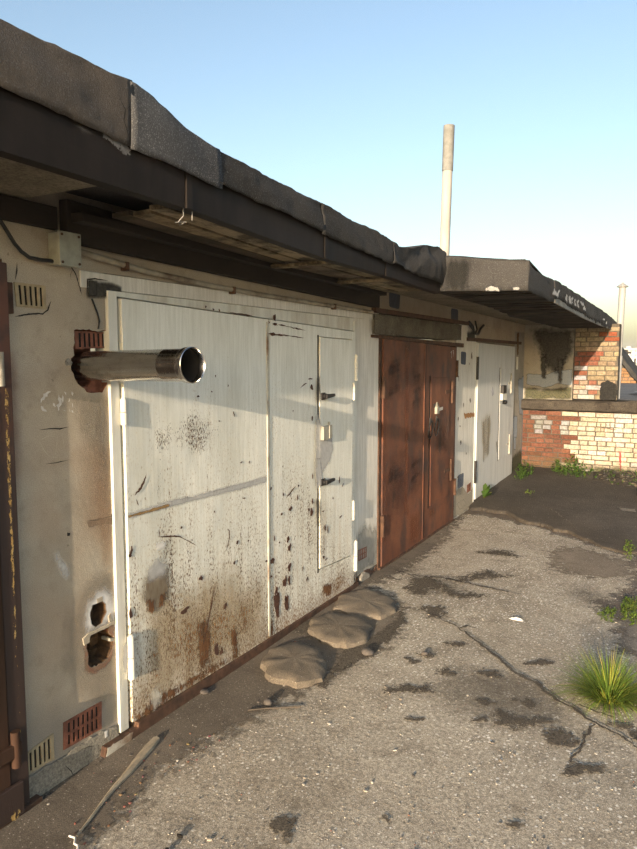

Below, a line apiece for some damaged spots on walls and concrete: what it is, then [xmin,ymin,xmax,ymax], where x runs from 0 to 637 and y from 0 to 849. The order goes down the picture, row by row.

spalling [65,331,104,366]
spalling [76,381,102,393]
corrosion [156,415,213,460]
corrosion [144,544,169,614]
corrosion [320,563,357,600]
crack [390,568,519,594]
spalling [82,613,115,674]
corrosion [138,593,257,719]
crack [420,607,637,762]